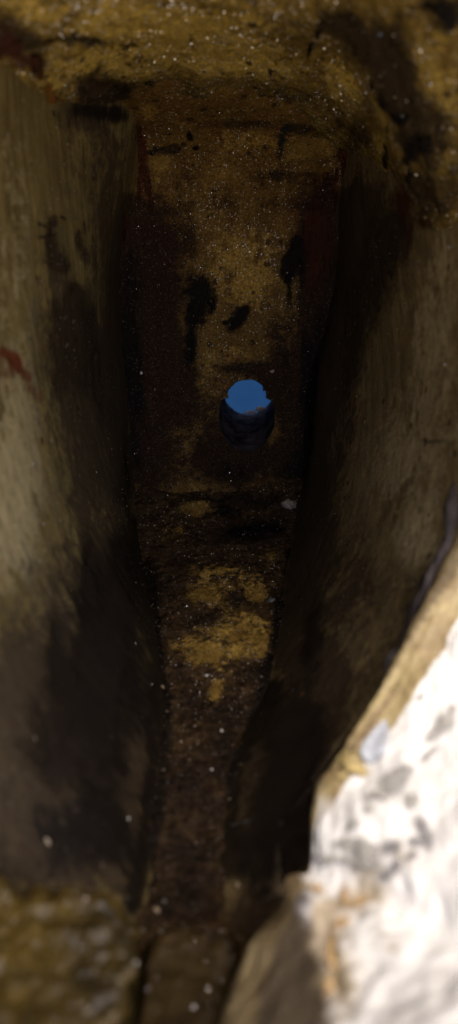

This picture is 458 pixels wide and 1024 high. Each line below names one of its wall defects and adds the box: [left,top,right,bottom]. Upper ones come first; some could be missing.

leakage [279,232,309,303]
leakage [184,272,217,363]
leakage [222,305,251,332]
rust [0,347,41,400]